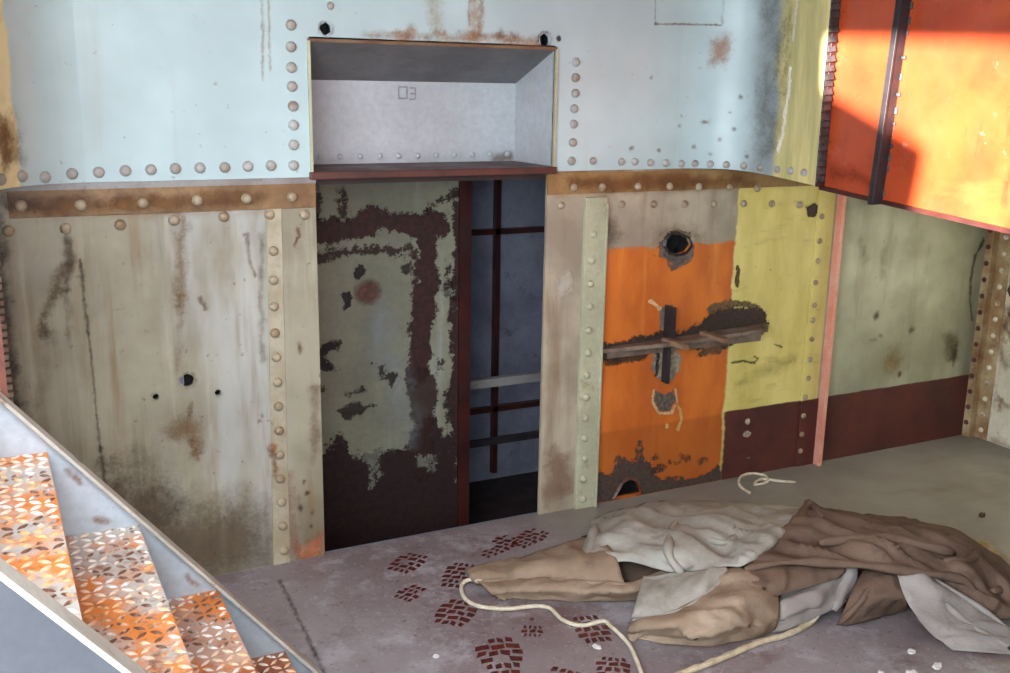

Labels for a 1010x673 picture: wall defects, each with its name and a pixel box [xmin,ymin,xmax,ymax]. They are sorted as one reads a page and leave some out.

rust [0,118,14,163]
peeling [648,299,677,329]
peeling [316,184,459,552]
peeling [597,440,721,503]
water stain [122,496,255,565]